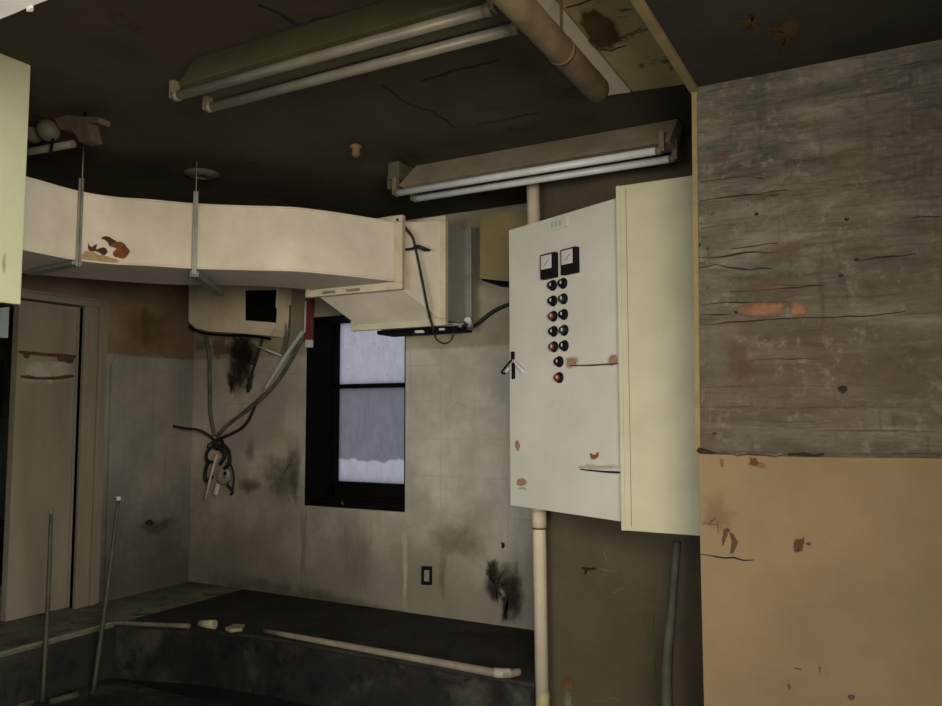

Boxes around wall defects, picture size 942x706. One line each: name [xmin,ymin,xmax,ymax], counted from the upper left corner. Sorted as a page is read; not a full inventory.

spalling [734,302,807,316]
crack [700,553,751,561]
water stain [487,561,520,619]